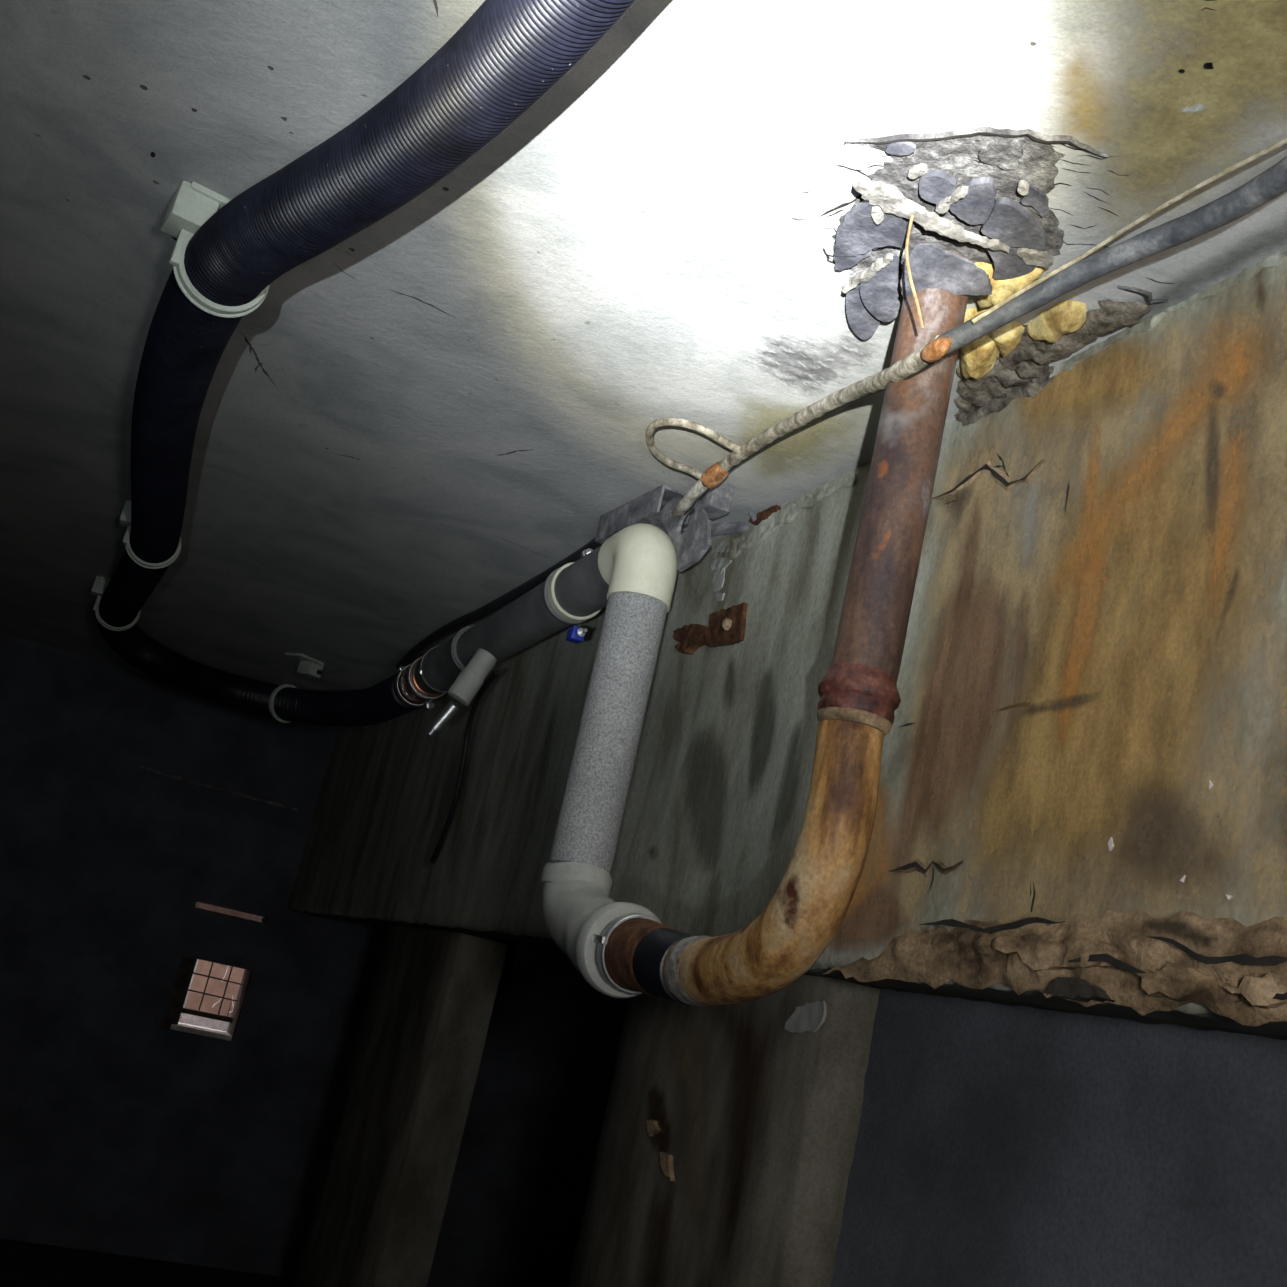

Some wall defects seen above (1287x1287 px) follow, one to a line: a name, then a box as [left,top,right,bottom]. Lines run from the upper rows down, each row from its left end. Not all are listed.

spalling [760,135,1065,390]
spalling [954,300,1151,426]
crack [931,454,1045,504]
crack [1063,482,1071,514]
corrosion [981,344,1250,854]
crack [889,859,963,890]
spalling [822,909,1287,1027]